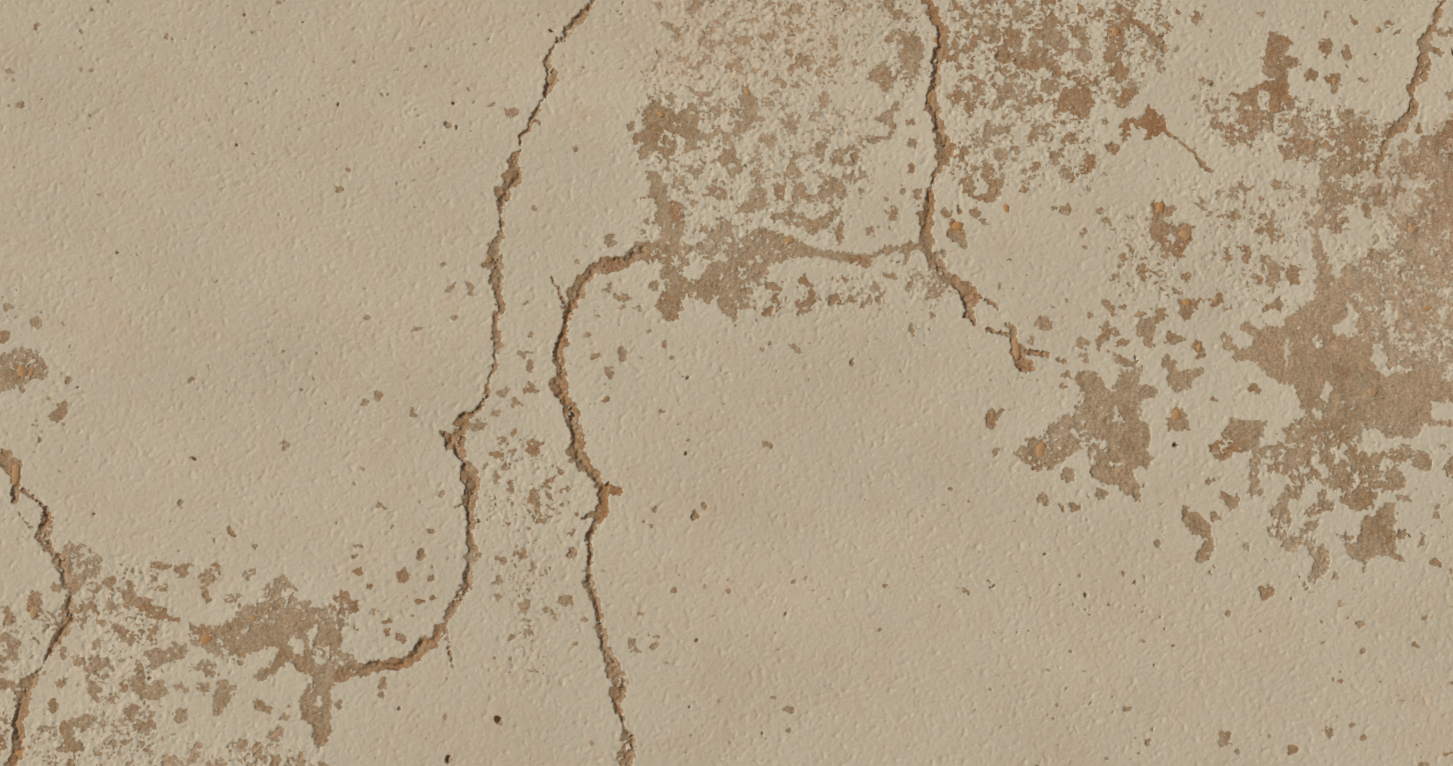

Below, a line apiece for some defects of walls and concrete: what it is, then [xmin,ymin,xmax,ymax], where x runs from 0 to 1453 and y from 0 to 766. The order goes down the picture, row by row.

peeling [0,330,73,423]
crack [0,448,79,766]
peeling [0,540,407,766]
crack [335,0,596,682]
peeling [470,331,579,661]
crack [549,246,649,766]
peeling [584,315,628,403]
peeling [585,0,1203,335]
crack [916,0,1068,374]
peeling [985,408,1005,430]
peeling [992,11,1453,591]
crack [1374,0,1447,177]